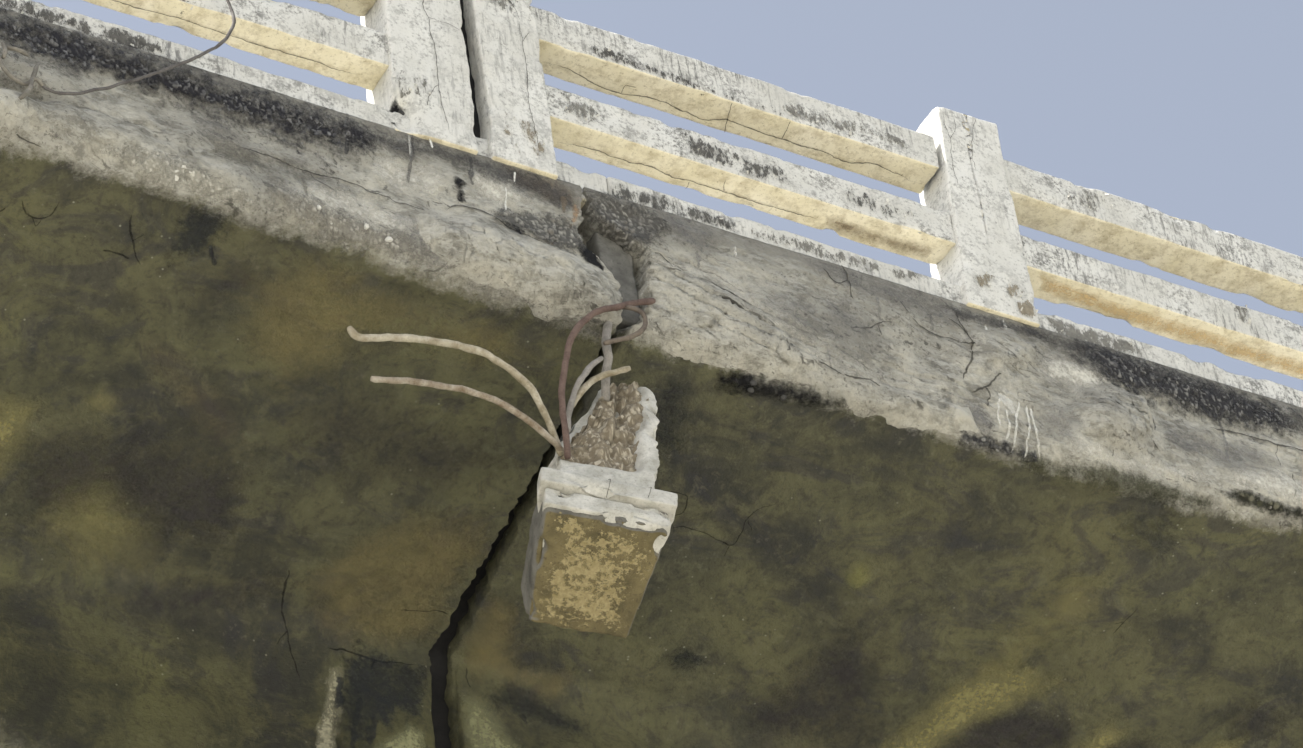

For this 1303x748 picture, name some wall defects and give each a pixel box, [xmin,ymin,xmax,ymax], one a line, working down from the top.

crack [422,0,456,127]
crack [943,115,976,183]
damp [173,207,224,265]
damp [313,188,438,258]
damp [955,309,1107,387]
damp [656,385,679,449]
damp [1118,355,1303,500]
damp [1024,447,1211,506]
peeling [532,512,653,632]
damp [317,526,476,748]
damp [467,684,578,748]
damp [891,669,1068,748]